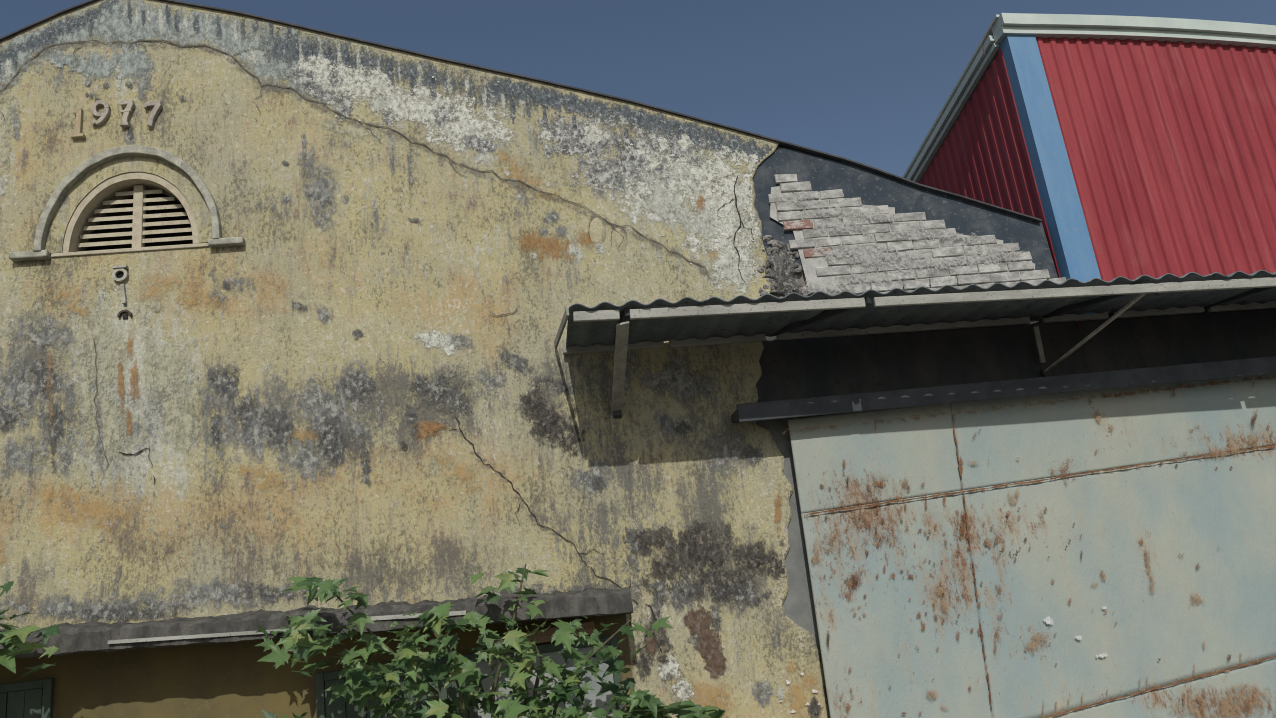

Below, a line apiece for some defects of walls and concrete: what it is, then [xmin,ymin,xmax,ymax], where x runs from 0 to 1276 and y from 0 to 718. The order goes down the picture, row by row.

crack [0,39,754,282]
spalling [283,55,1066,298]
leakage [0,306,128,477]
corrosion [118,330,139,434]
leakage [207,273,255,305]
leakage [136,299,384,489]
peeling [414,330,473,356]
leakage [404,349,609,494]
crack [429,415,663,653]
leakage [623,520,788,681]
corrosion [804,409,1276,718]